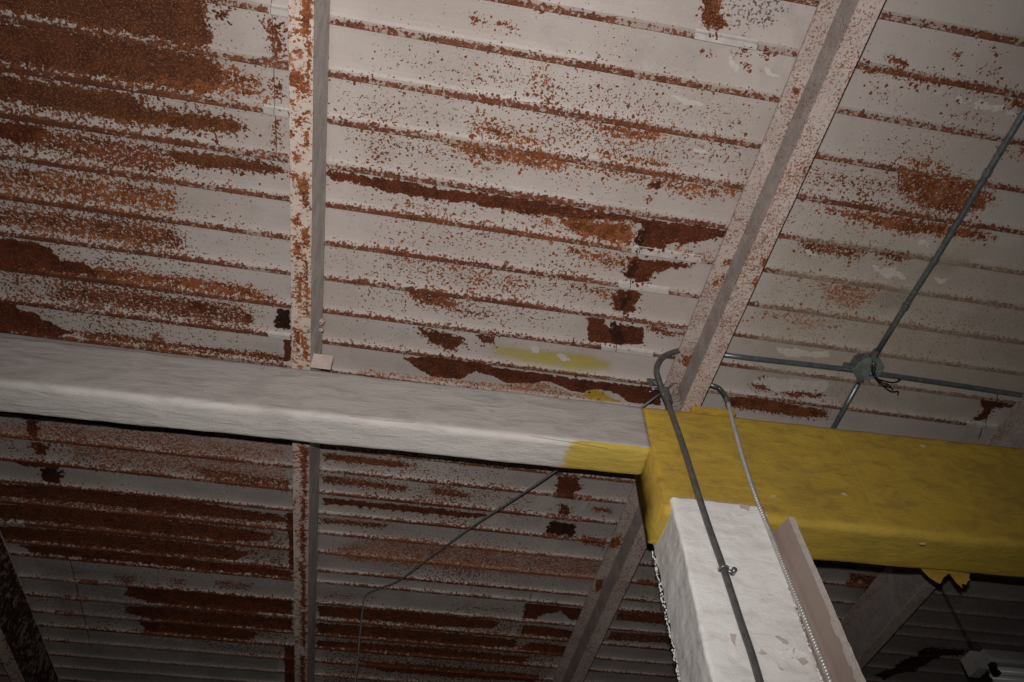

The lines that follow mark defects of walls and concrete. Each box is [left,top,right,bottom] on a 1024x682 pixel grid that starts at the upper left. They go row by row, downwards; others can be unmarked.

rust [695,0,791,73]
rust [855,46,1024,131]
rust [0,0,314,365]
rust [326,7,759,406]
rust [746,147,1002,342]
rust [723,375,832,421]
rust [970,398,1013,425]
rust [0,413,624,682]
rust [603,610,672,645]